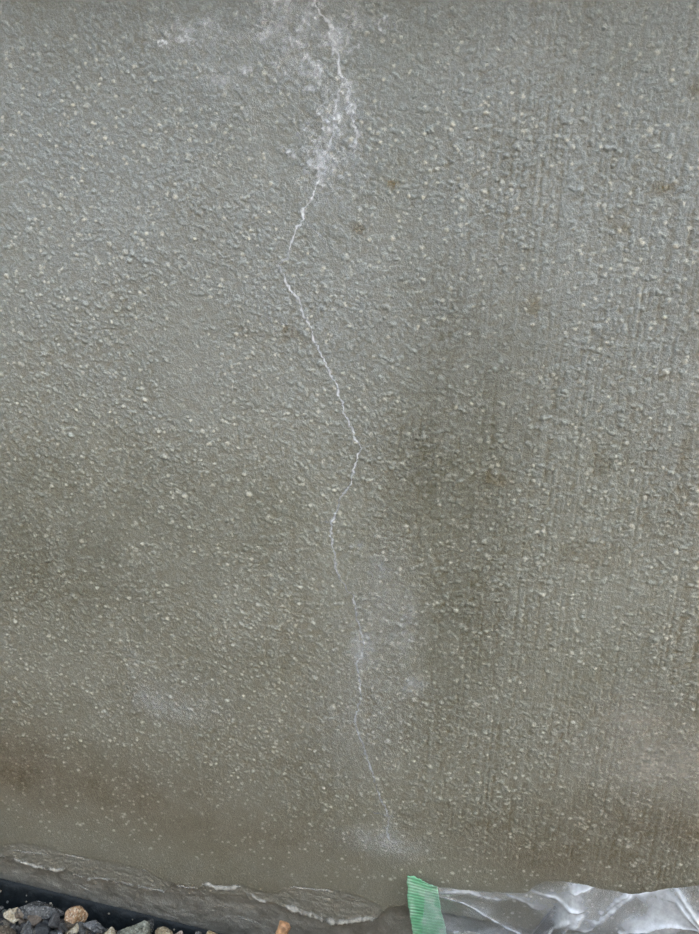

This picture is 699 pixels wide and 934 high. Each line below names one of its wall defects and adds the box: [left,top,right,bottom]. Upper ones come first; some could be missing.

leakage [157,28,195,47]
leakage [254,4,323,91]
leakage [317,81,357,136]
crack [278,0,390,841]
peeling [14,852,64,873]
peeling [182,883,239,891]
peeling [286,906,373,926]